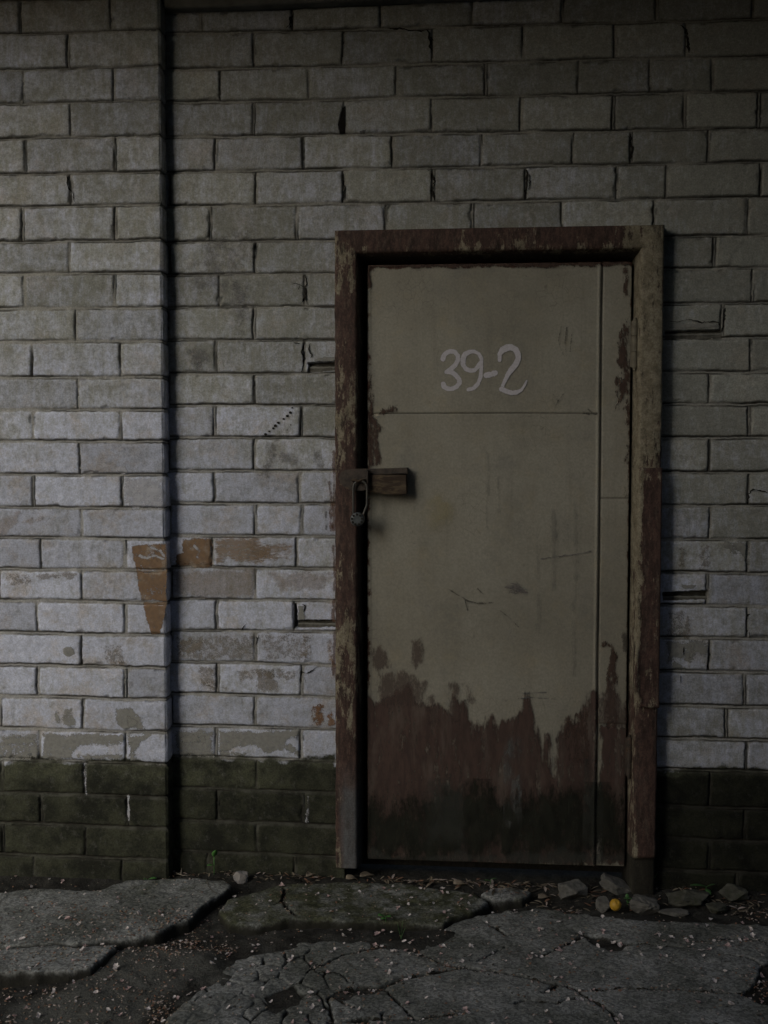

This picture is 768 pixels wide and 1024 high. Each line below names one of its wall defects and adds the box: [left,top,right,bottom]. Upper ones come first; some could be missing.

spalling [298,606,336,627]
peeling [0,708,152,761]
peeling [175,729,301,758]
corrosion [368,633,628,866]
crack [244,926,759,1023]